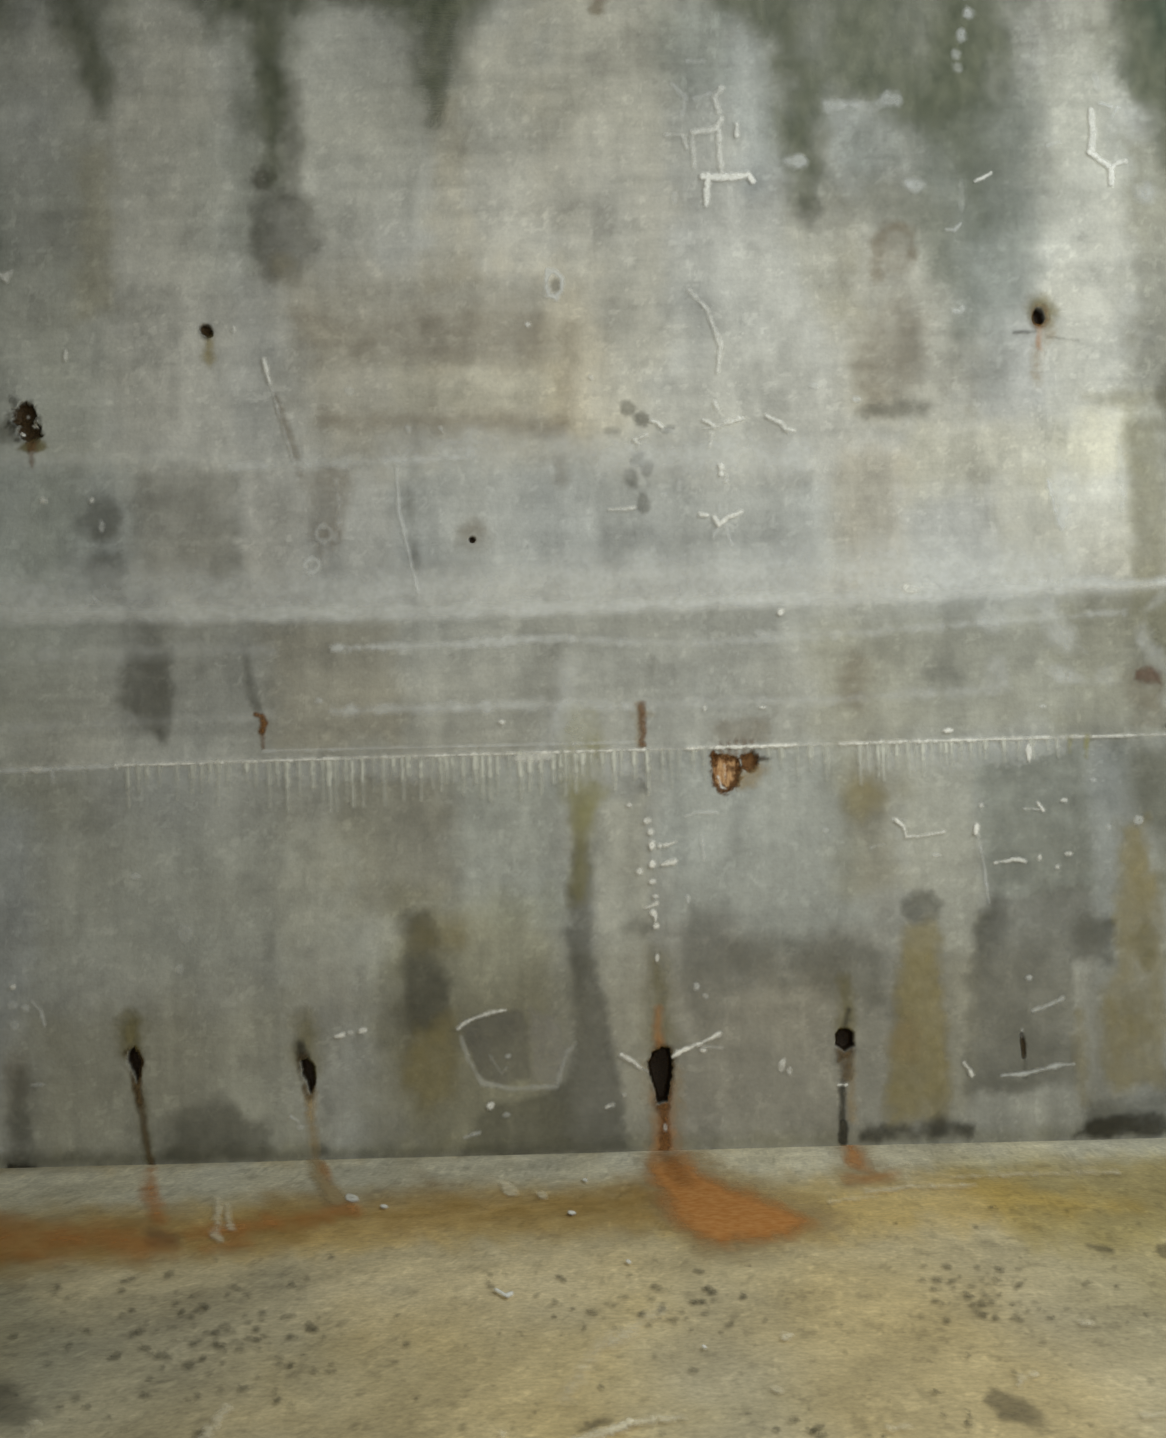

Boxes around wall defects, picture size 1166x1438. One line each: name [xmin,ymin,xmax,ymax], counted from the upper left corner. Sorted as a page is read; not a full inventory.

corrosion [651,1152,823,1245]